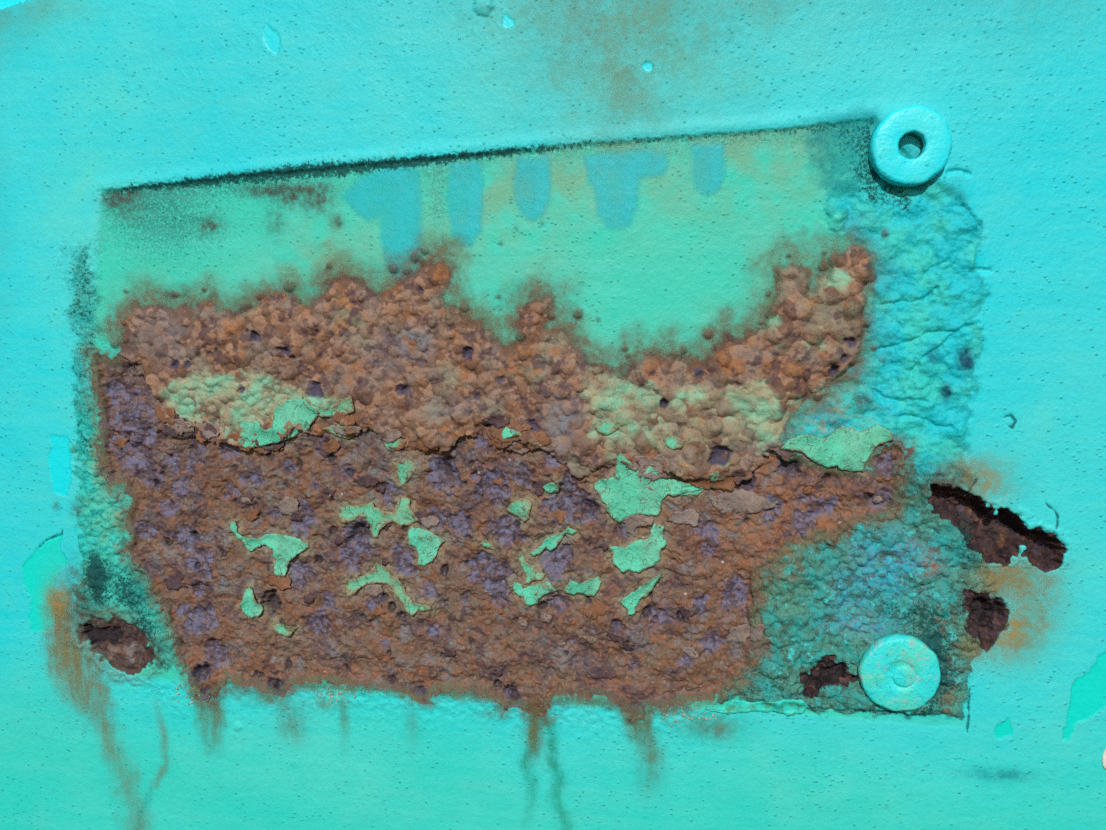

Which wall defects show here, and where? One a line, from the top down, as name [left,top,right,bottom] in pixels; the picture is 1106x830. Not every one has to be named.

peeling [0,0,31,10]
corrosion [85,235,997,735]
corrosion [49,589,107,731]
peeling [1062,653,1106,741]